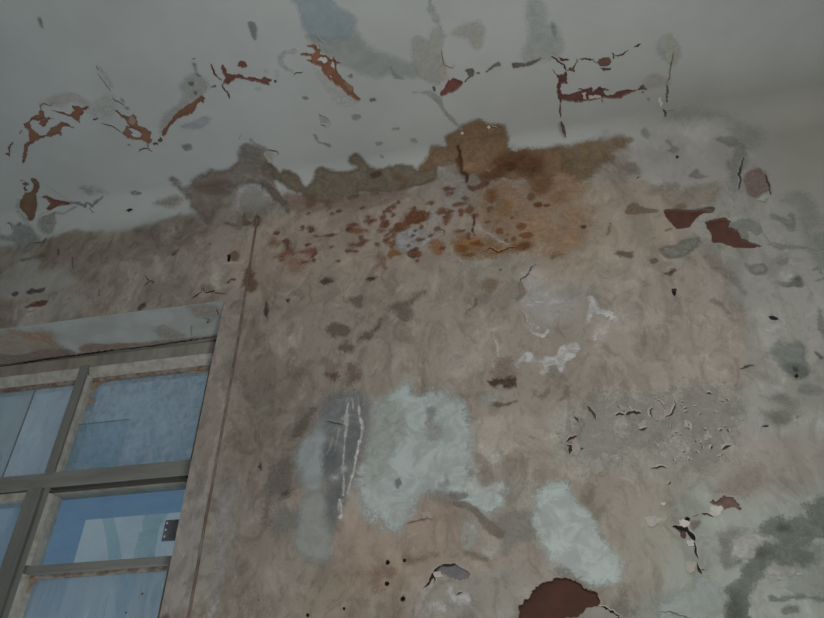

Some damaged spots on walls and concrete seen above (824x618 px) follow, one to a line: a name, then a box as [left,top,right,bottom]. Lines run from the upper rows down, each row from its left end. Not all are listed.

spalling [19,102,90,163]
leakage [294,0,457,125]
spalling [552,69,650,103]
leakage [0,213,55,261]
rust [269,225,335,272]
rust [345,119,631,269]
spalling [663,204,804,249]
leakage [327,323,355,352]
leakage [292,362,368,530]
peeling [353,380,511,534]
peeling [518,479,623,618]
leakage [719,496,824,618]